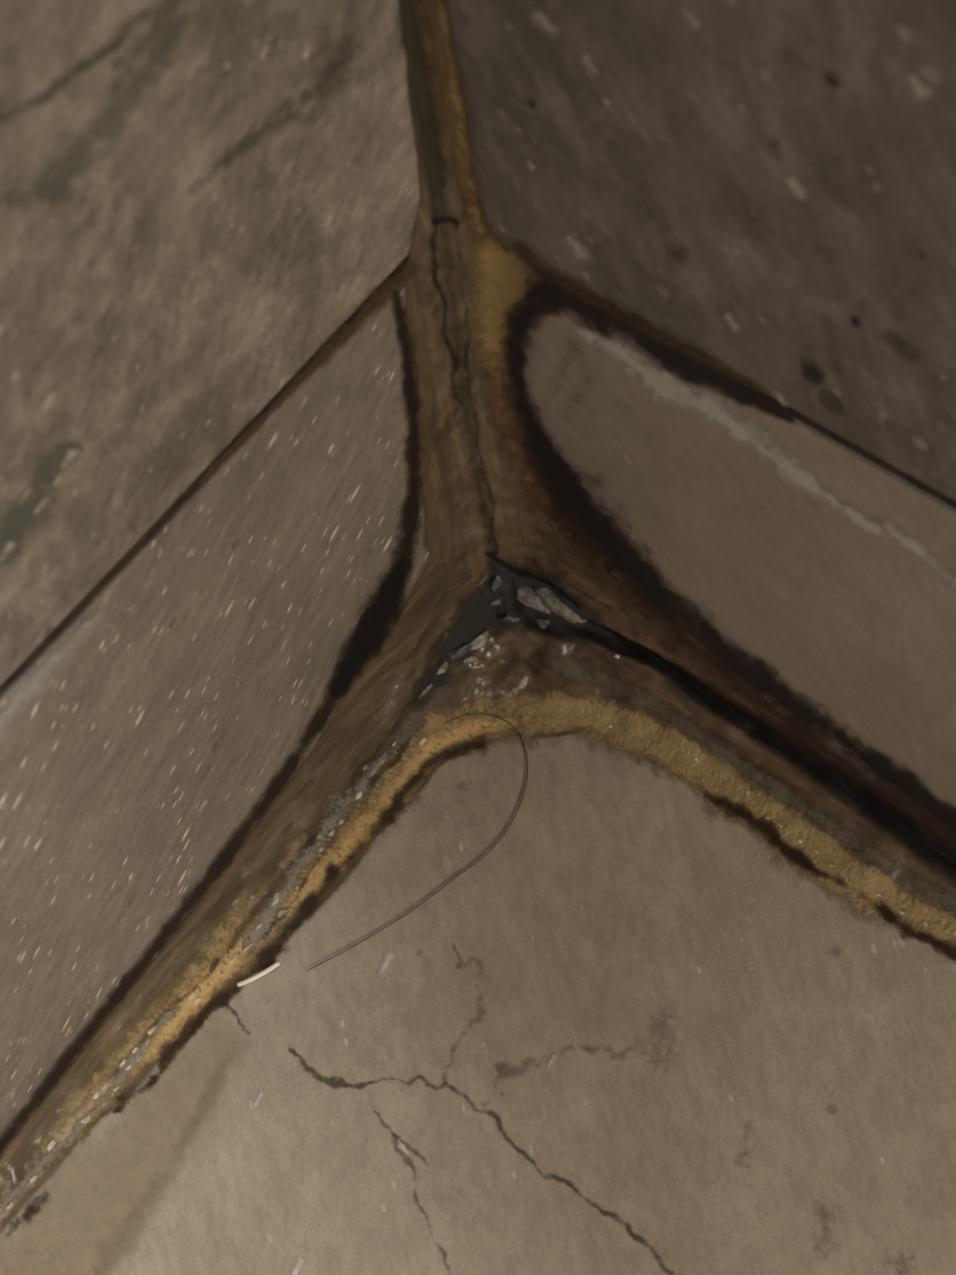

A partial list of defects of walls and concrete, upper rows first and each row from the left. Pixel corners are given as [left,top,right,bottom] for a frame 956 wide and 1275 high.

leakage [486,278,956,849]
peeling [484,575,587,629]
peeling [419,630,489,700]
crack [225,1002,249,1033]
crack [288,1048,674,1275]